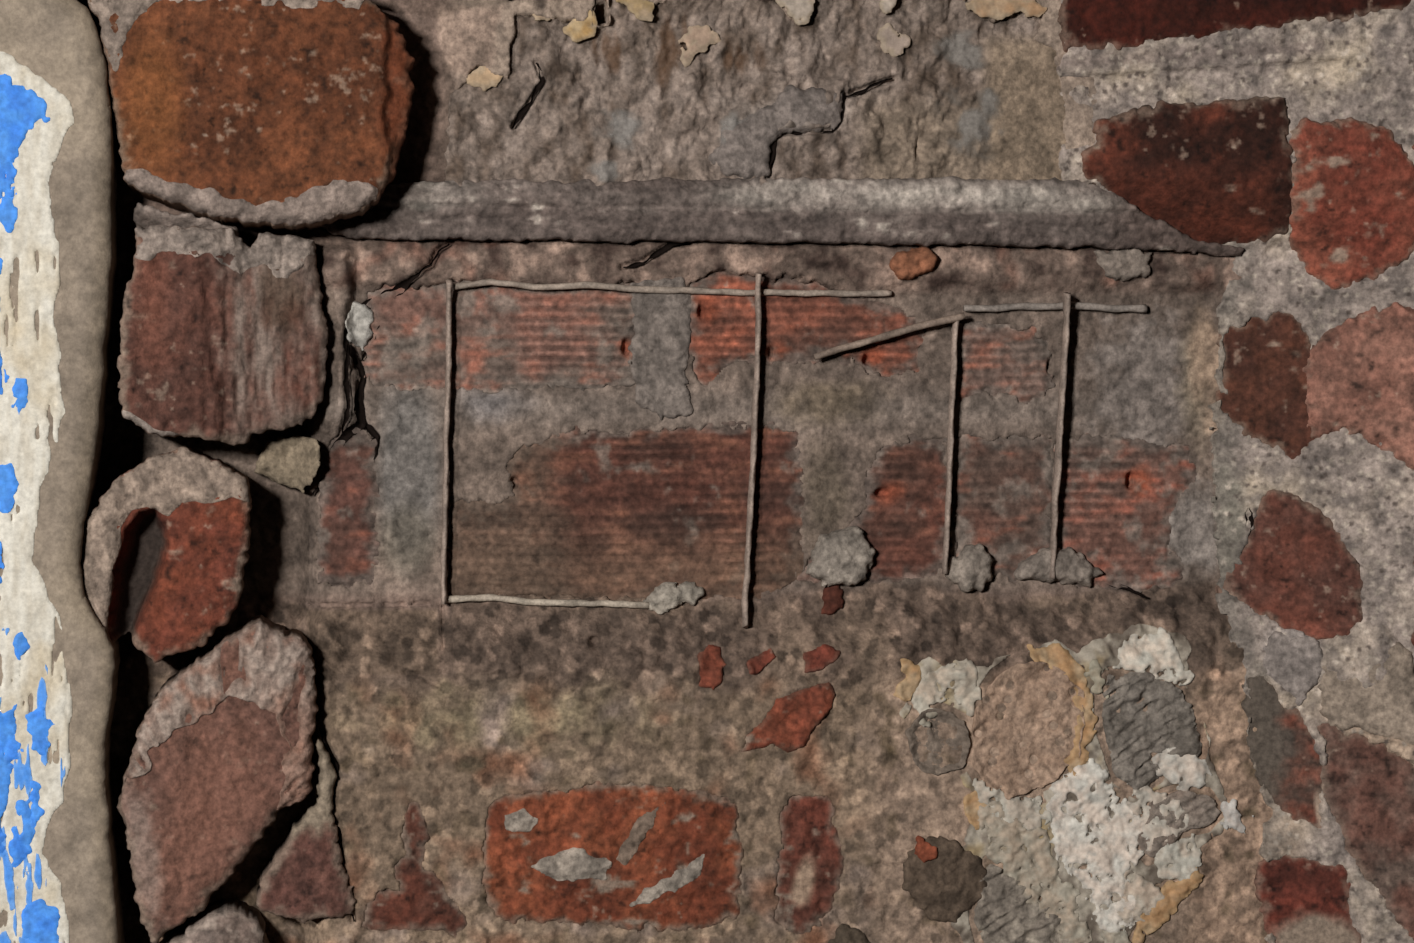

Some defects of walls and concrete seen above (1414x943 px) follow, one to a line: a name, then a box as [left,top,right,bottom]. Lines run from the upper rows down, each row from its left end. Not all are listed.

spalling [444,0,1066,186]
crack [767,78,893,178]
peeling [0,51,74,943]